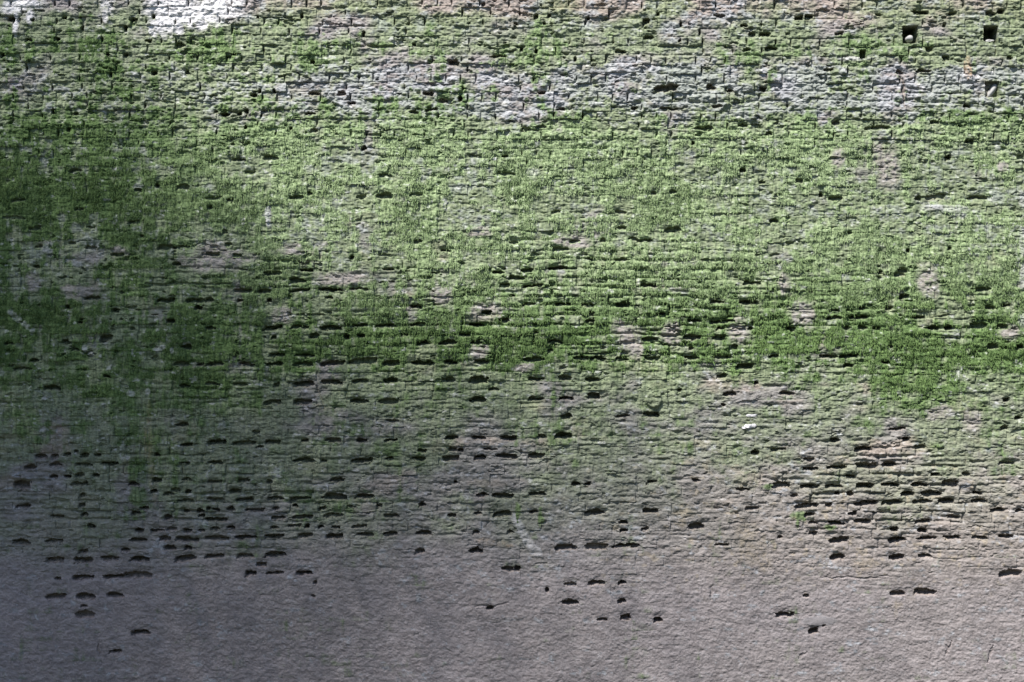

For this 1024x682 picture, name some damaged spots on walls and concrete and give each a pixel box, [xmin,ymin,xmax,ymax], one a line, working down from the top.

leakage [264,202,272,228]
leakage [917,203,971,221]
leakage [1014,189,1024,292]
leakage [674,501,699,531]